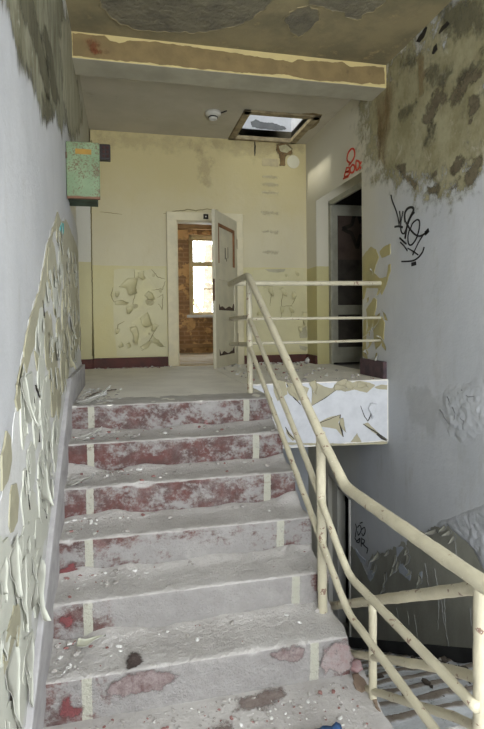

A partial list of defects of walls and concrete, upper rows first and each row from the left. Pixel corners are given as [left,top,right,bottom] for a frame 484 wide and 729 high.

mould [2,0,83,141]
flaking render [72,0,388,84]
water stain [358,0,484,204]
peeling [111,268,168,357]
peeling [362,244,391,361]
peeling [253,379,388,447]
peeling [0,211,82,729]
peeling [350,540,466,599]
peeling [420,525,484,573]
peeling [384,596,473,648]
spalling [107,652,177,698]